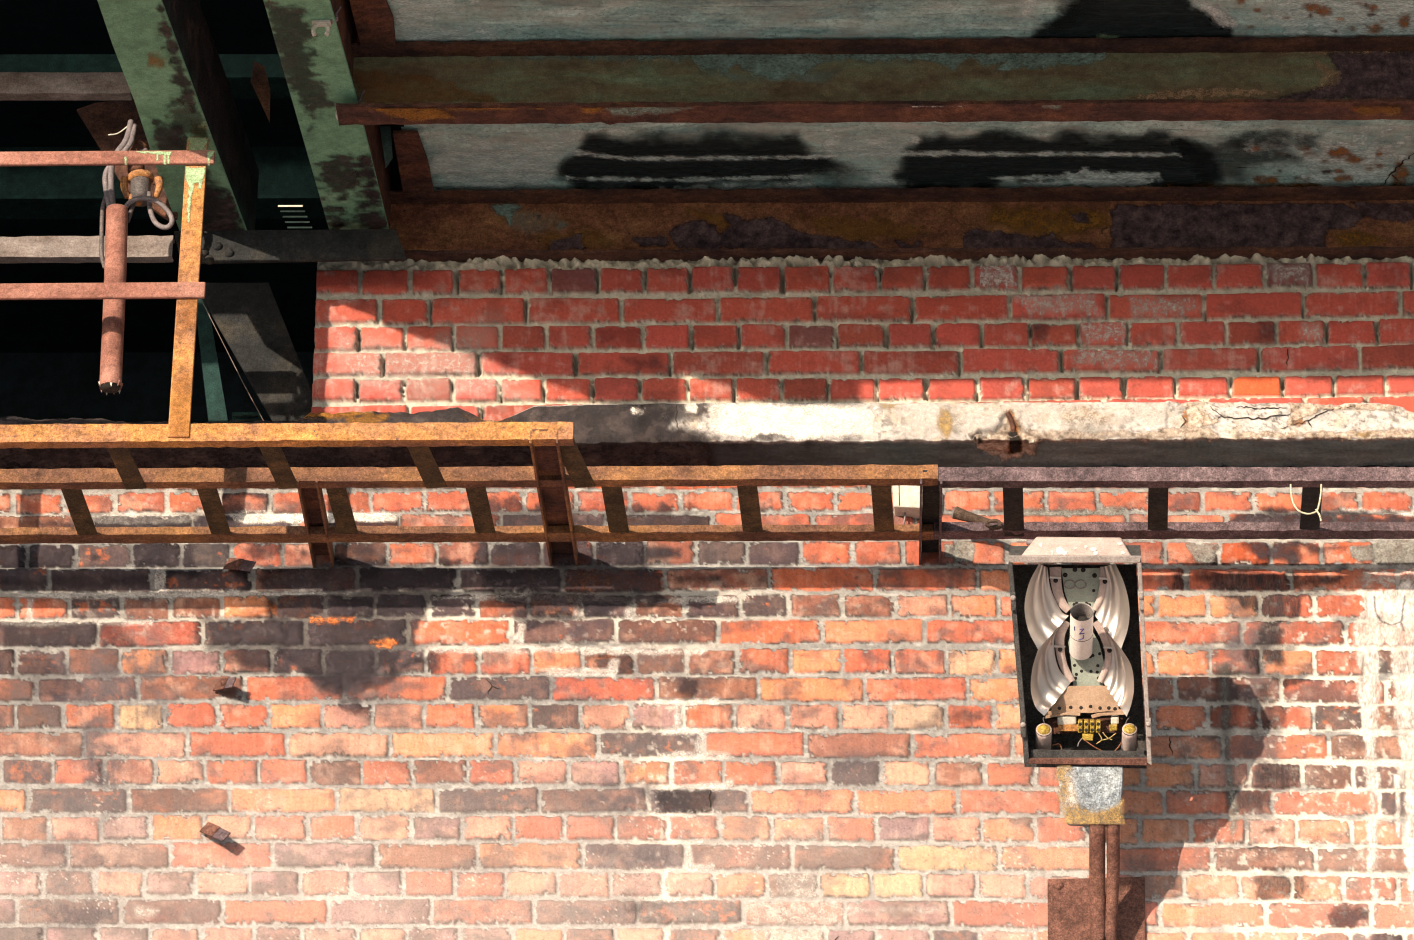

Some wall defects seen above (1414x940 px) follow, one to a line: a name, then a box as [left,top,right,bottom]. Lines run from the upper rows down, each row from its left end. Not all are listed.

water stain [394,0,497,41]
water stain [1032,0,1237,39]
water stain [1255,0,1414,37]
peeling [1130,88,1276,100]
water stain [431,126,1411,190]
water stain [637,403,719,447]
spalling [969,403,1414,462]
crack [1181,405,1362,429]
water stain [195,619,288,674]
water stain [308,650,437,714]
water stain [1354,568,1414,899]